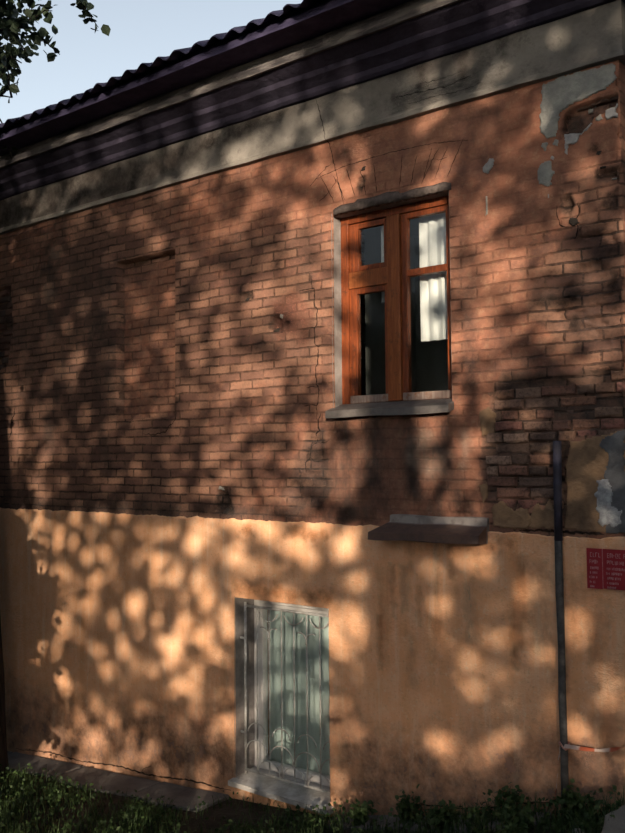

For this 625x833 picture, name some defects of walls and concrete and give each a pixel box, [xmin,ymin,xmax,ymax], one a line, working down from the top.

flaking render [537,63,620,198]
crack [298,276,326,471]
spalling [479,366,625,534]
damp [8,701,219,785]
crack [16,748,229,790]